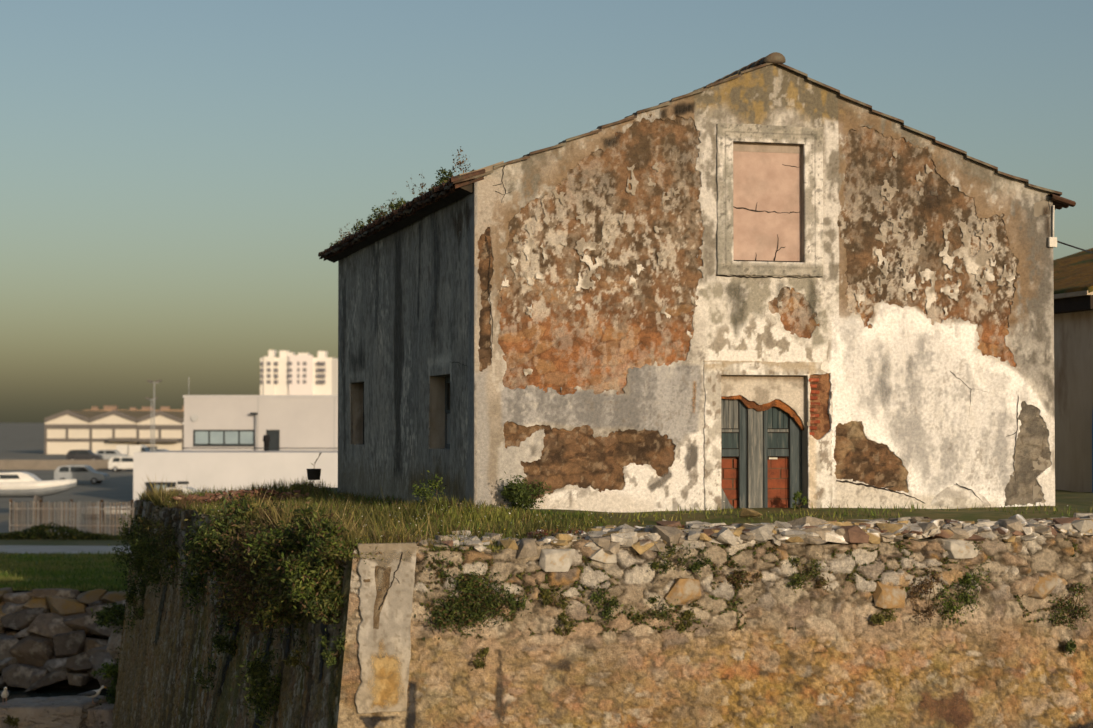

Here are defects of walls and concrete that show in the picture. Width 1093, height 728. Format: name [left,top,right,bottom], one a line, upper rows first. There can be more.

leakage [340,285,364,430]
leakage [394,237,402,474]
spalling [477,114,704,395]
spalling [768,287,820,339]
spalling [837,126,1020,367]
spalling [503,421,676,500]
spalling [721,373,909,493]
spalling [1004,401,1051,506]
leakage [361,682,416,728]
leakage [496,652,508,721]